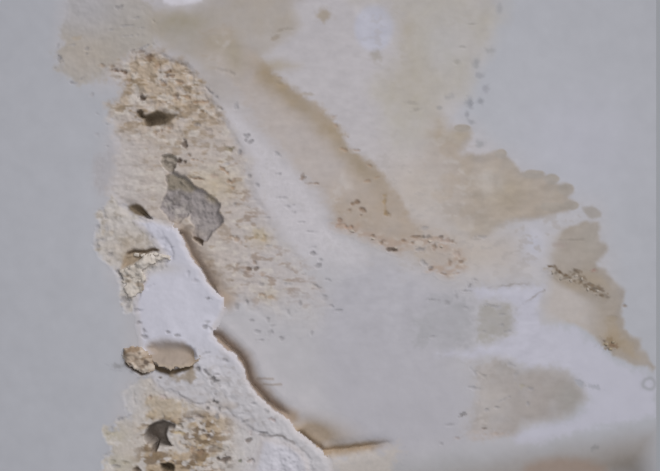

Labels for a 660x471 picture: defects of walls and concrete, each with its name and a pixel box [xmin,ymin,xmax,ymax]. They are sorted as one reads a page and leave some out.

spalling [88,41,375,471]
leakage [47,0,656,392]
leakage [396,287,656,471]